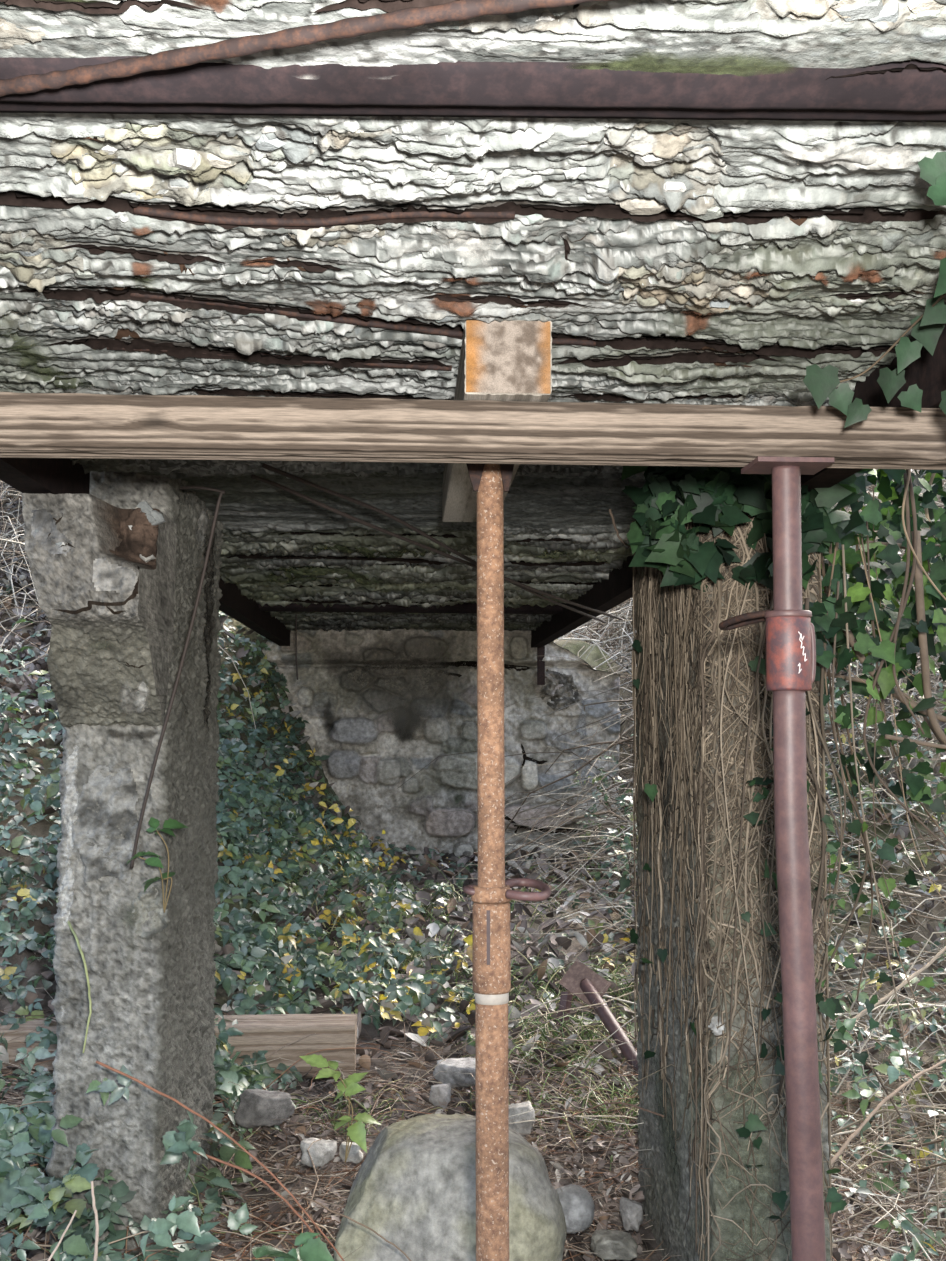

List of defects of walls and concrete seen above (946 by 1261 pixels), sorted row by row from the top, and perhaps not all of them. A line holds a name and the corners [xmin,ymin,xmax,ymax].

corrosion [193,0,229,12]
spalling [50,122,399,206]
spalling [282,224,385,247]
spalling [0,230,96,292]
corrosion [133,261,151,275]
corrosion [242,257,274,267]
corrosion [307,298,376,317]
spalling [617,261,774,316]
spalling [92,501,166,594]
crack [53,566,140,614]